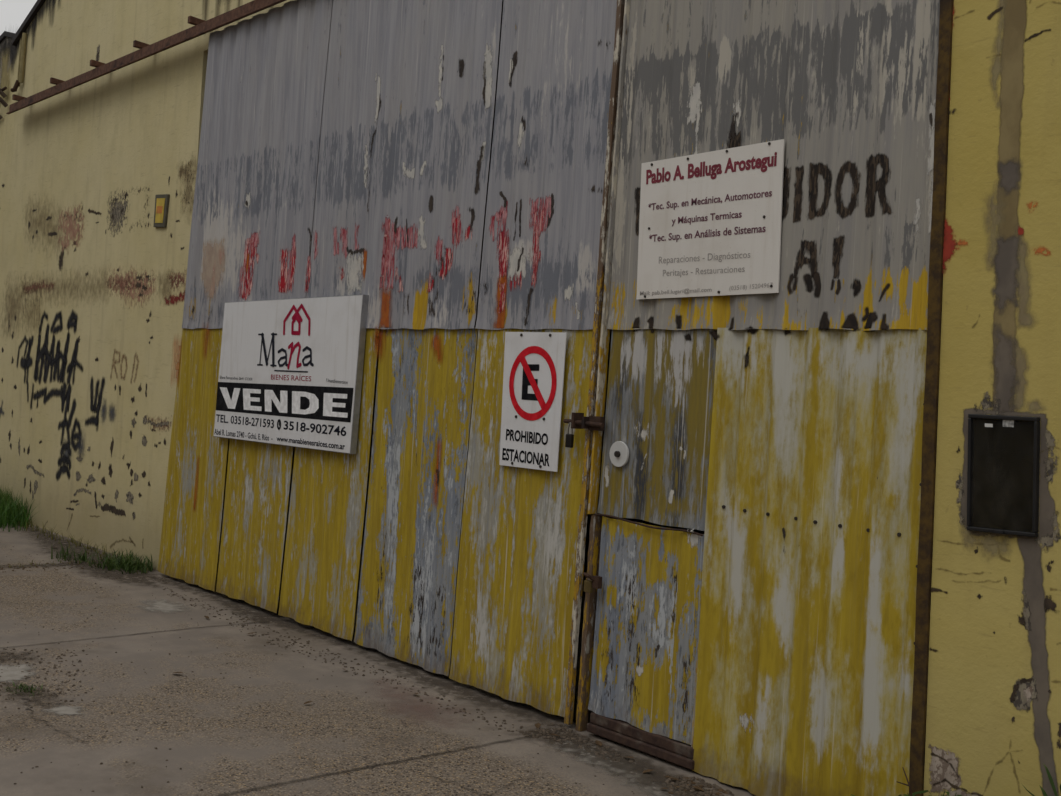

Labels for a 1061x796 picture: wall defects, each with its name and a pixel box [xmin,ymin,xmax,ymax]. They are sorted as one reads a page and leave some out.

peeling [687,81,702,154]
peeling [729,101,741,142]
peeling [475,141,486,194]
peeling [333,226,364,293]
peeling [379,195,475,316]
peeling [464,191,551,326]
peeling [687,528,701,547]
peeling [409,565,446,658]
peeling [625,575,643,706]
peeling [1009,678,1051,722]
peeling [928,745,983,796]